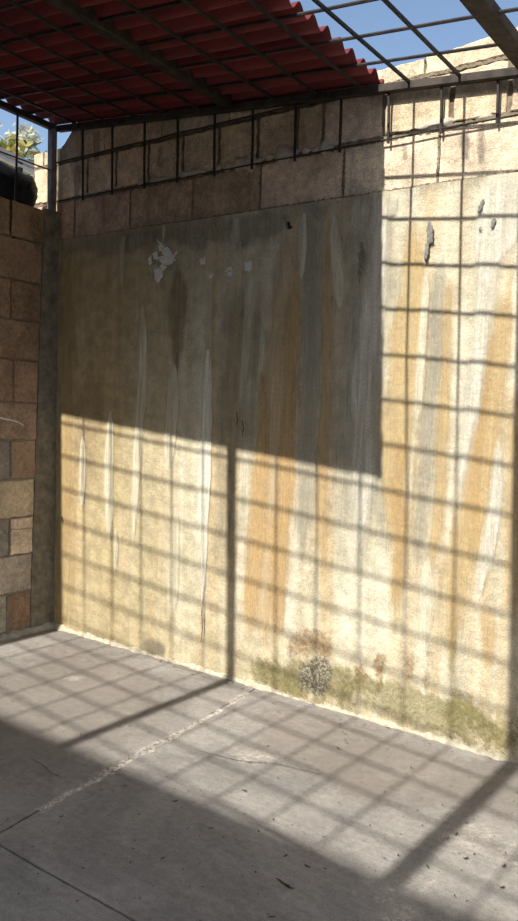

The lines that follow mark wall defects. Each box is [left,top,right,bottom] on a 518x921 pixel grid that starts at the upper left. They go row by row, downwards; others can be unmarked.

peeling [148,239,177,283]
damp [104,411,117,556]
damp [132,306,148,532]
damp [199,348,212,604]
rust [381,232,424,602]
rust [431,287,451,563]
rust [445,305,515,660]
damp [298,655,332,698]